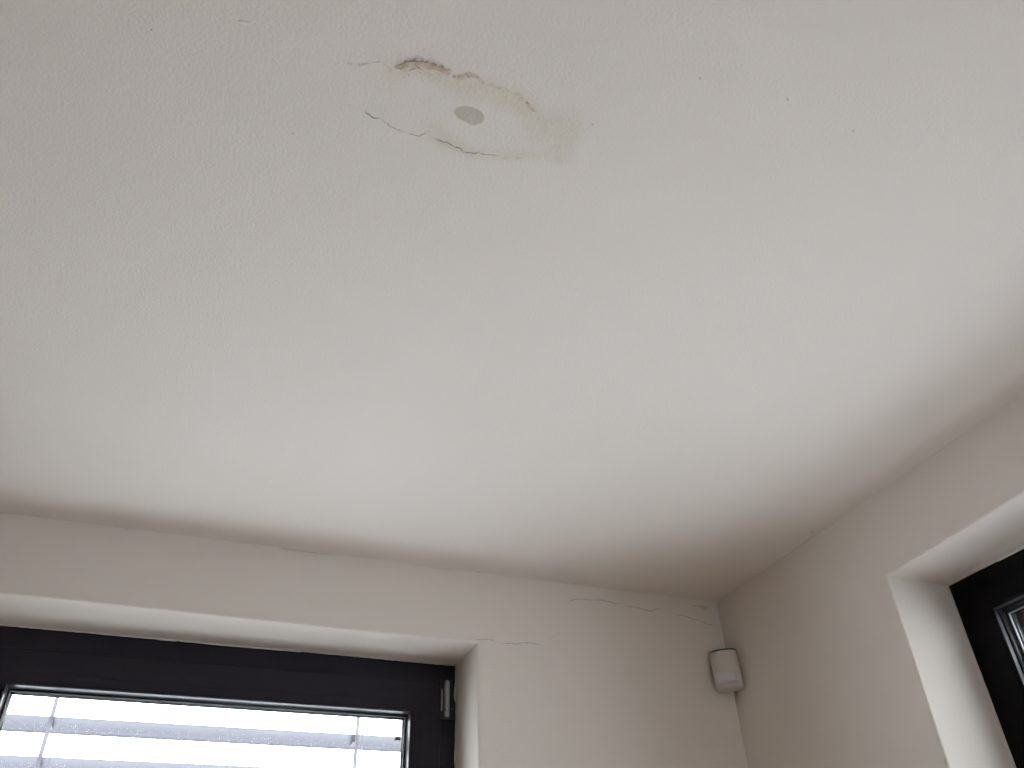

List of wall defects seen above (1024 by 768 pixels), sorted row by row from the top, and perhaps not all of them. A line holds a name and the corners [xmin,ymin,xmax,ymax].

peeling [395,60,451,82]
damp [351,54,595,171]